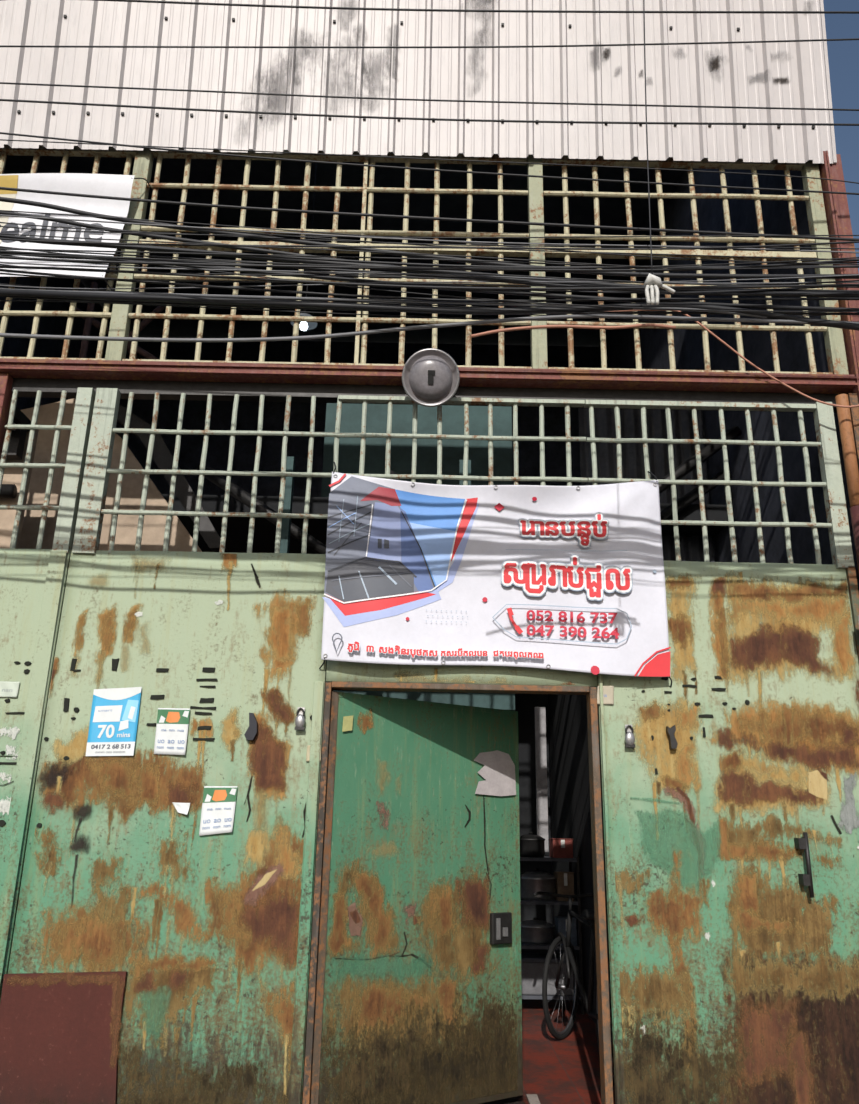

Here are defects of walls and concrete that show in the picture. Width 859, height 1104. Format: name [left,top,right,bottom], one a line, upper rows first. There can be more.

rust [221,553,237,610]
rust [8,589,317,1095]
rust [192,1061,267,1104]
rust [615,572,859,1104]